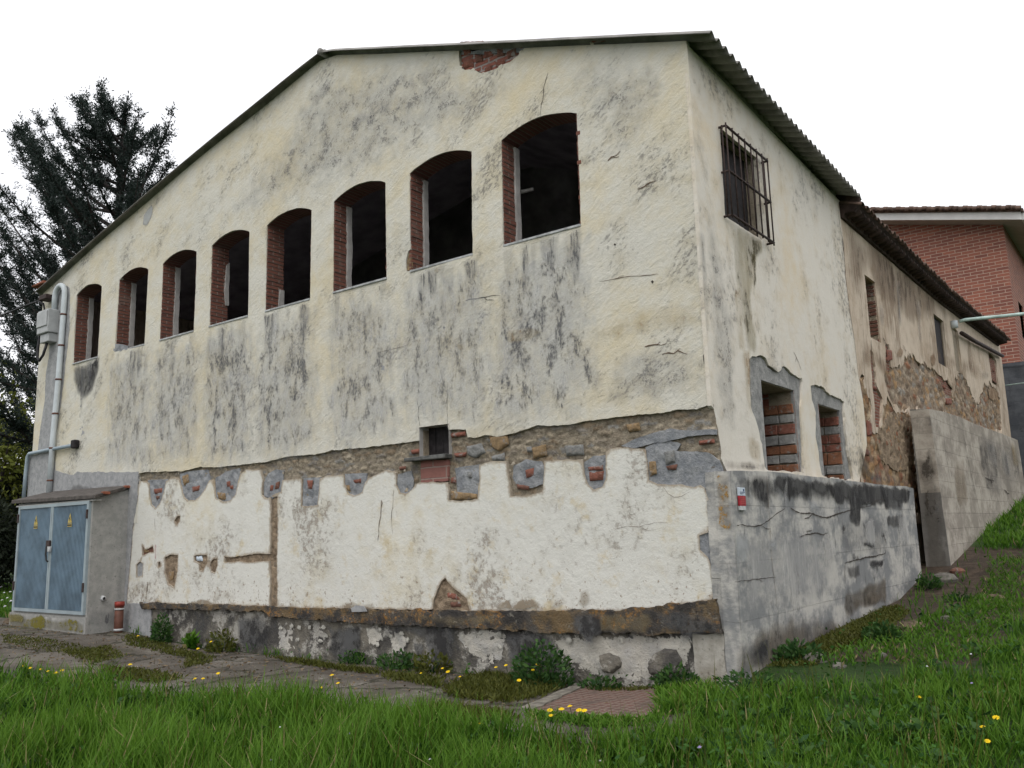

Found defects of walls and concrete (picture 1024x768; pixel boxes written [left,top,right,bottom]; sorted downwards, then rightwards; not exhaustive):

leakage [75,359,98,399]
leakage [111,304,317,462]
leakage [404,260,484,405]
leakage [495,231,592,408]
flaking render [859,345,1001,515]
flaking render [137,547,178,586]
flaking render [148,468,241,514]
flaking render [433,579,470,611]
crack [737,486,904,599]
leakage [748,453,910,547]
peeling [457,629,506,664]
peeling [550,634,693,682]